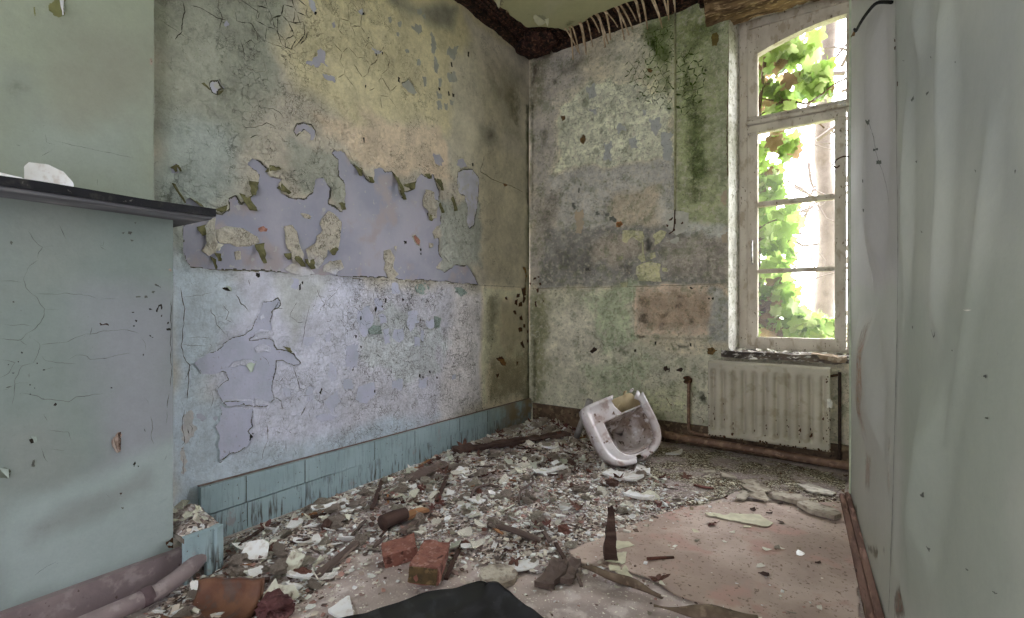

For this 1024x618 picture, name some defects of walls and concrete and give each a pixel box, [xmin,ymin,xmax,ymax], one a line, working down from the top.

peeling [202,77,227,98]
crack [161,0,398,109]
peeling [388,8,469,111]
peeling [533,14,549,27]
crack [552,25,729,179]
damp [644,17,668,61]
peeling [169,144,480,404]
crack [2,225,278,462]
peeling [190,294,302,463]